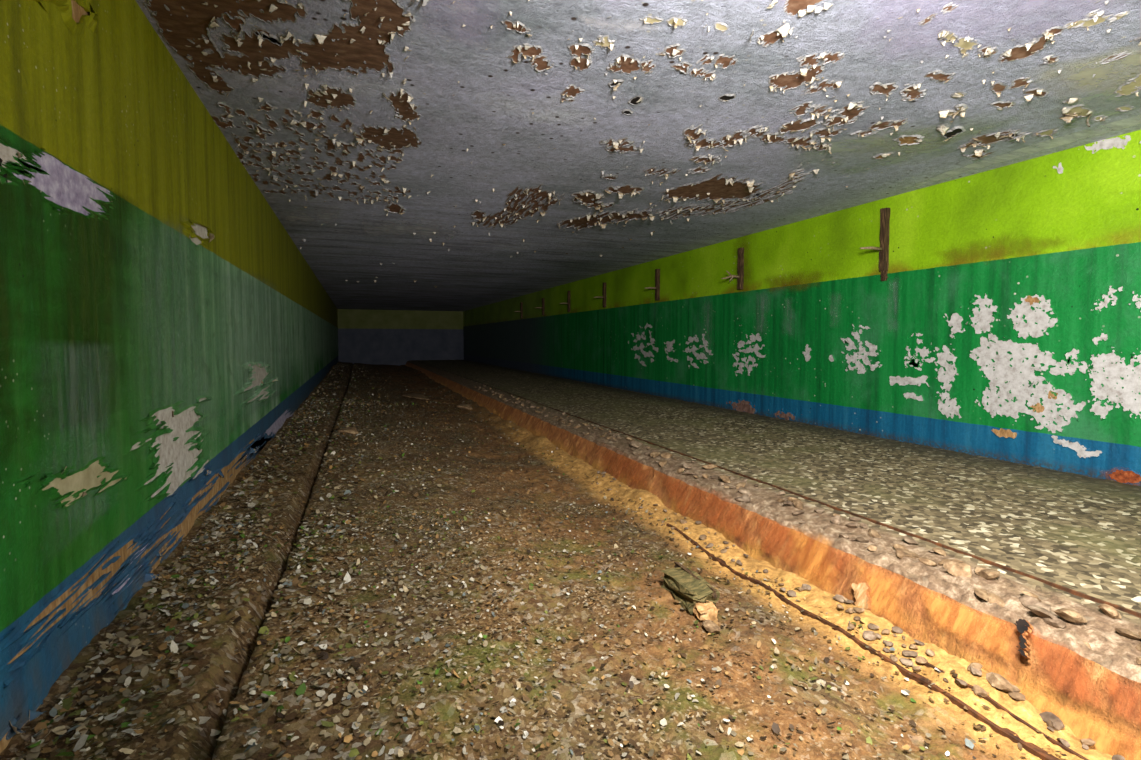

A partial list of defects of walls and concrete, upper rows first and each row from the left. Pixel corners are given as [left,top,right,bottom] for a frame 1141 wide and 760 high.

peeling [143,0,430,216]
peeling [470,0,1141,240]
peeling [0,140,116,220]
peeling [178,219,215,250]
peeling [234,361,279,408]
peeling [627,322,714,370]
peeling [726,398,757,414]
peeling [732,326,770,379]
peeling [802,343,813,363]
peeling [828,284,1141,459]
peeling [0,395,296,687]